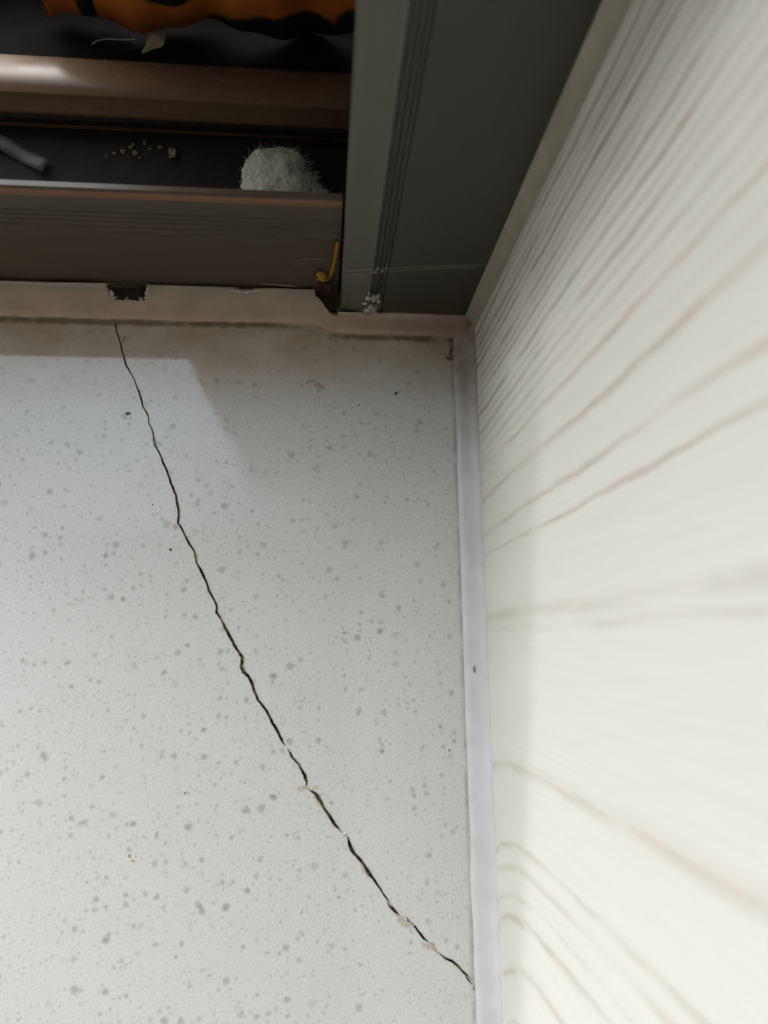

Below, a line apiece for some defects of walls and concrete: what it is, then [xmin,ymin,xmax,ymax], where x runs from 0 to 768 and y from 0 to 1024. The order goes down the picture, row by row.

crack [115,325,475,990]